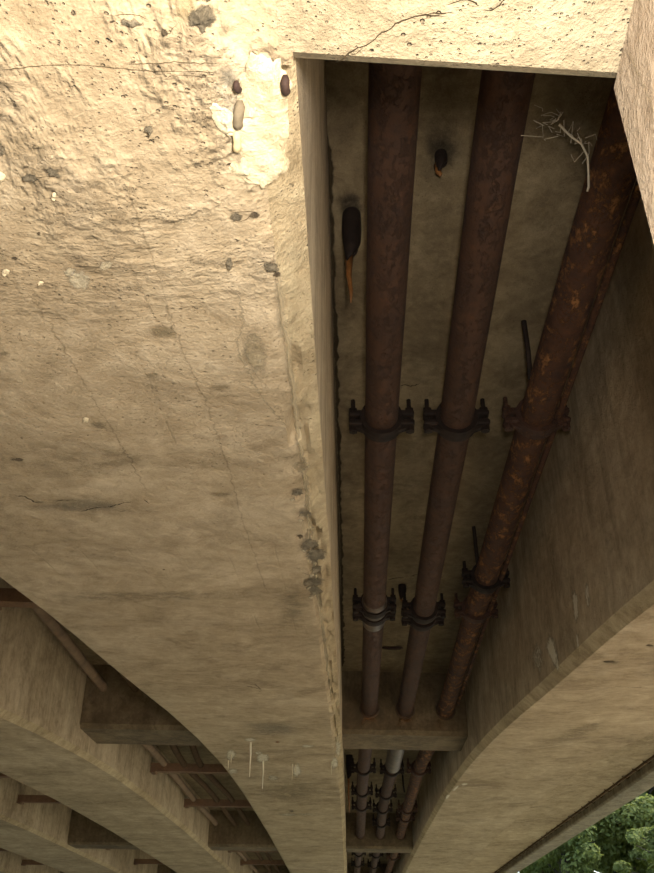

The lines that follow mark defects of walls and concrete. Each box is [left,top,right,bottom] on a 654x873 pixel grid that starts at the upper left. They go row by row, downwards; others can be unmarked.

crack [336,0,504,63]
spalling [209,52,293,189]
spalling [236,262,331,695]
efflorescence [245,738,277,789]